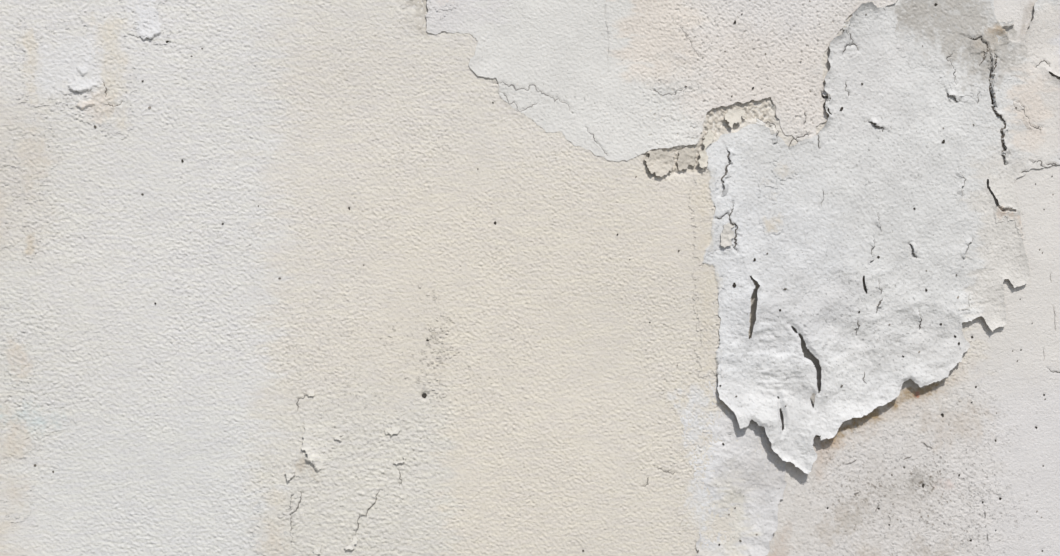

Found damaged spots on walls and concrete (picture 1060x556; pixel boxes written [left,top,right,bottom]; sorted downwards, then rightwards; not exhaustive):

crack [968,36,1057,172]
peeling [376,0,1060,556]
peeling [285,420,342,542]
peeling [345,490,383,550]